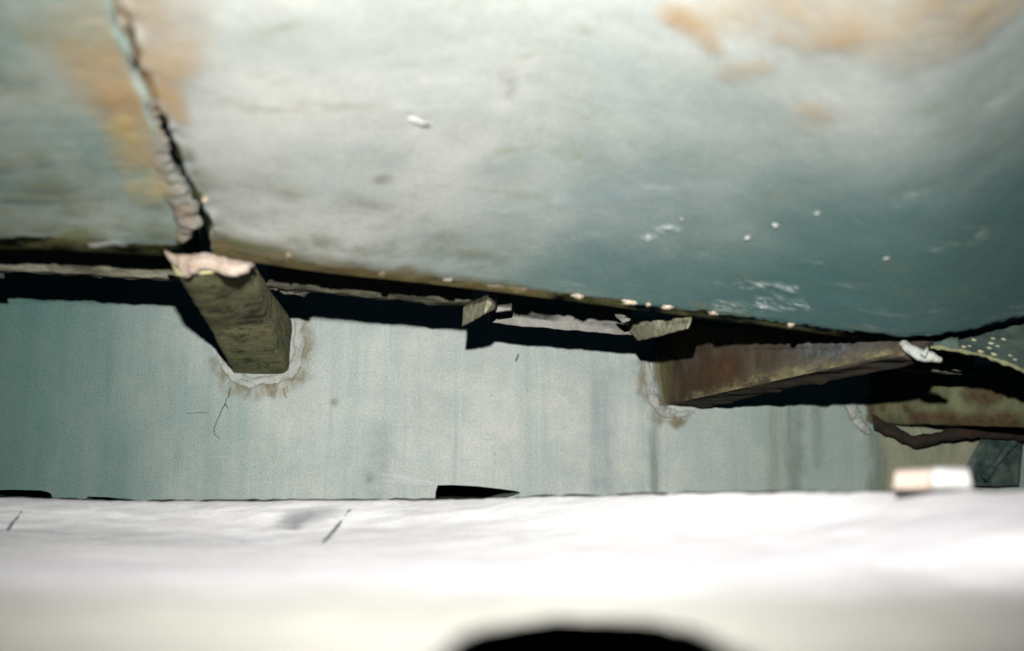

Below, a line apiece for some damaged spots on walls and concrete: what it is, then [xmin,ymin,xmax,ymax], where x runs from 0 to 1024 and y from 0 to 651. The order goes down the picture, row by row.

corrosion [99,80,142,125]
spalling [621,299,676,310]
crack [186,387,231,437]
corrosion [904,388,1020,427]